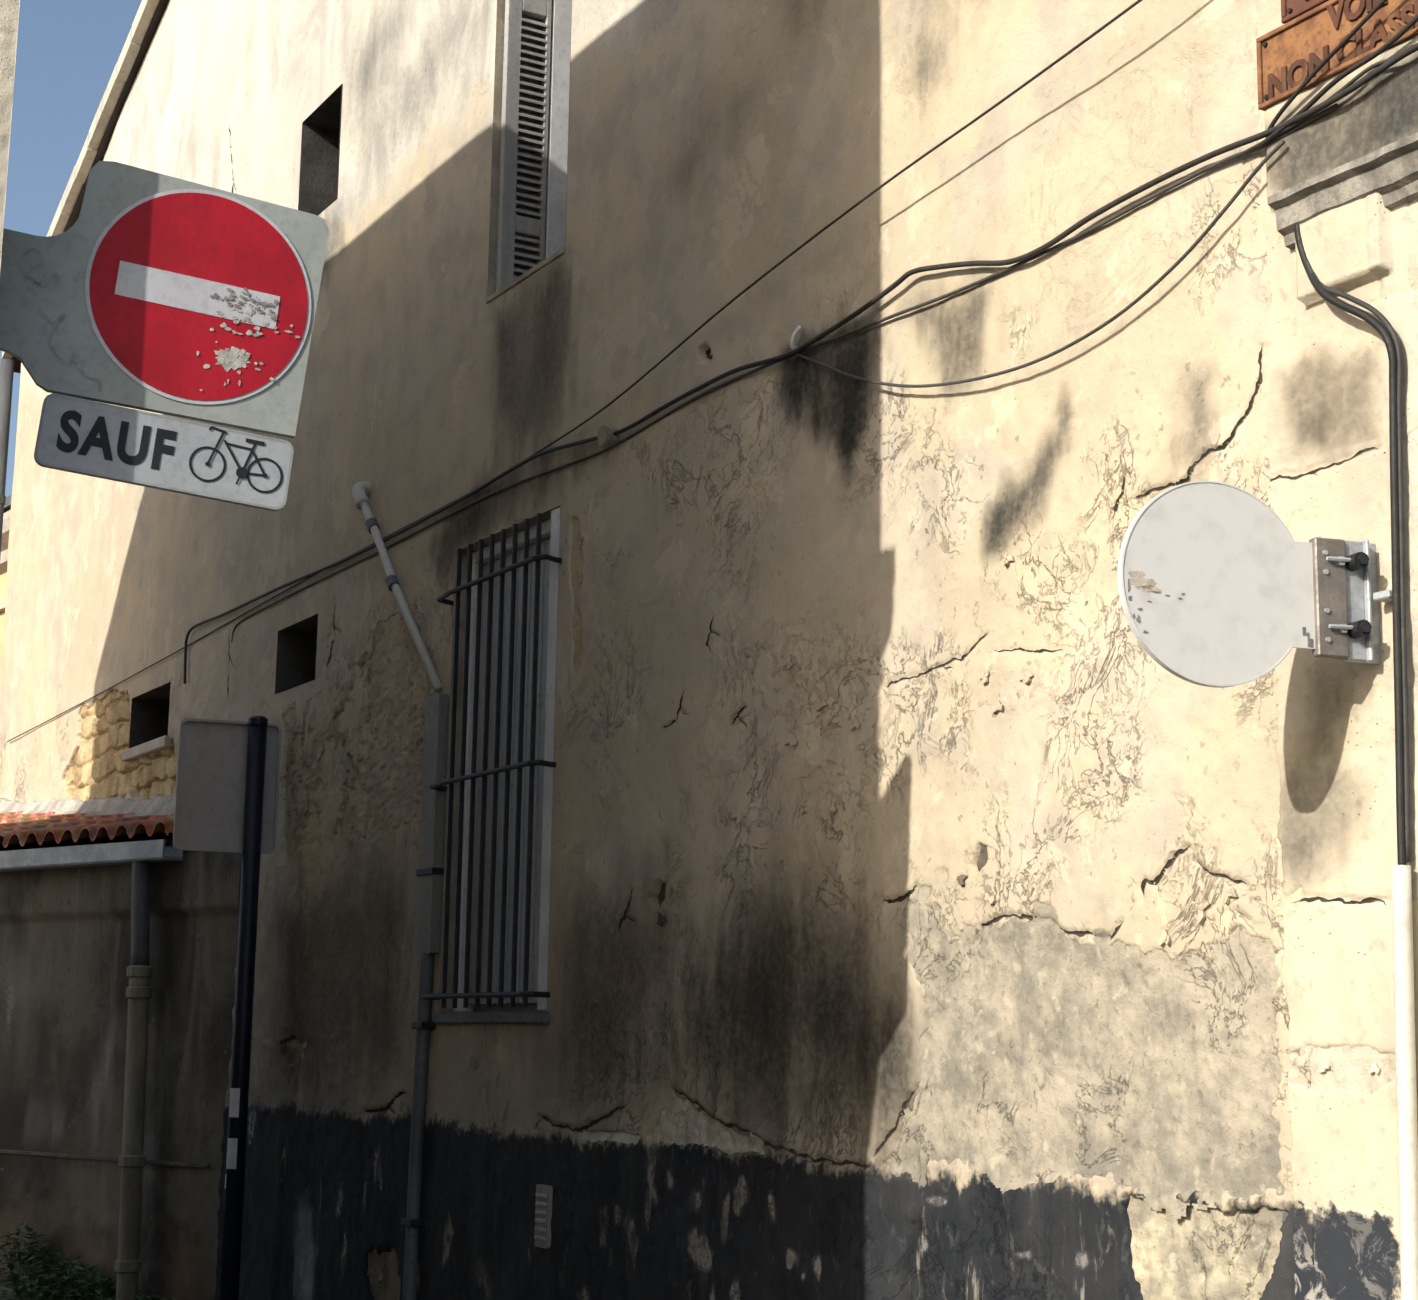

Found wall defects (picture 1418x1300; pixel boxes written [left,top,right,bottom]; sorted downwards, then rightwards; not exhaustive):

leakage [783,325,873,461]
crack [1111,347,1262,520]
leakage [989,447,1052,546]
crack [887,632,1062,687]
spalling [65,690,177,801]
crack [982,846,1250,939]
spalling [580,1090,765,1257]
crack [673,1088,917,1169]
spalling [884,862,1396,1300]
peeling [366,1248,419,1300]
peeling [689,1229,711,1269]
peeling [786,1251,821,1279]